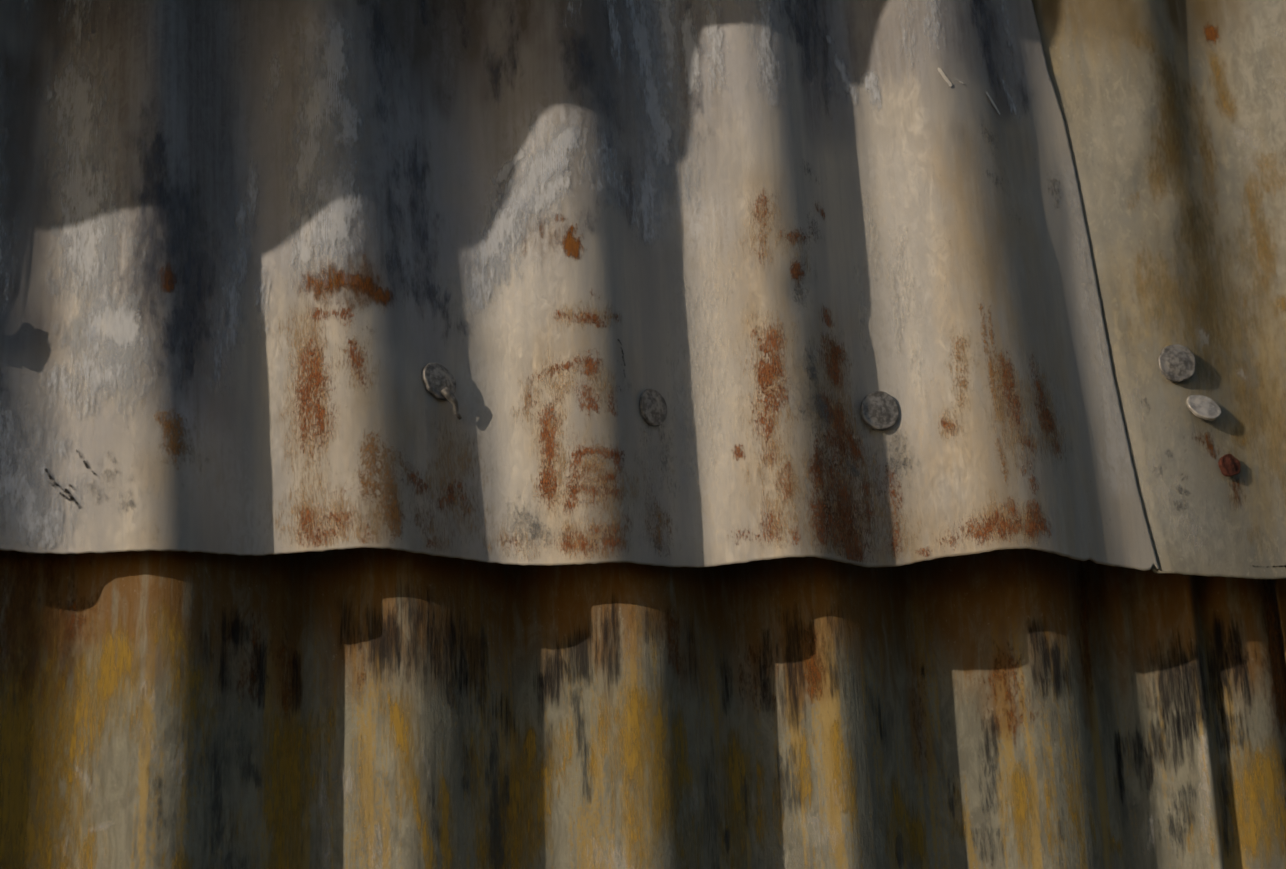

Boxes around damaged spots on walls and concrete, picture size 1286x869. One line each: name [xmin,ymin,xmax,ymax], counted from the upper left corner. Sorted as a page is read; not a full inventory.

corrosion [539,215,583,259]
corrosion [753,194,815,283]
corrosion [279,255,393,475]
corrosion [281,429,486,548]
corrosion [524,351,638,558]
corrosion [732,320,801,545]
corrosion [860,307,1066,557]